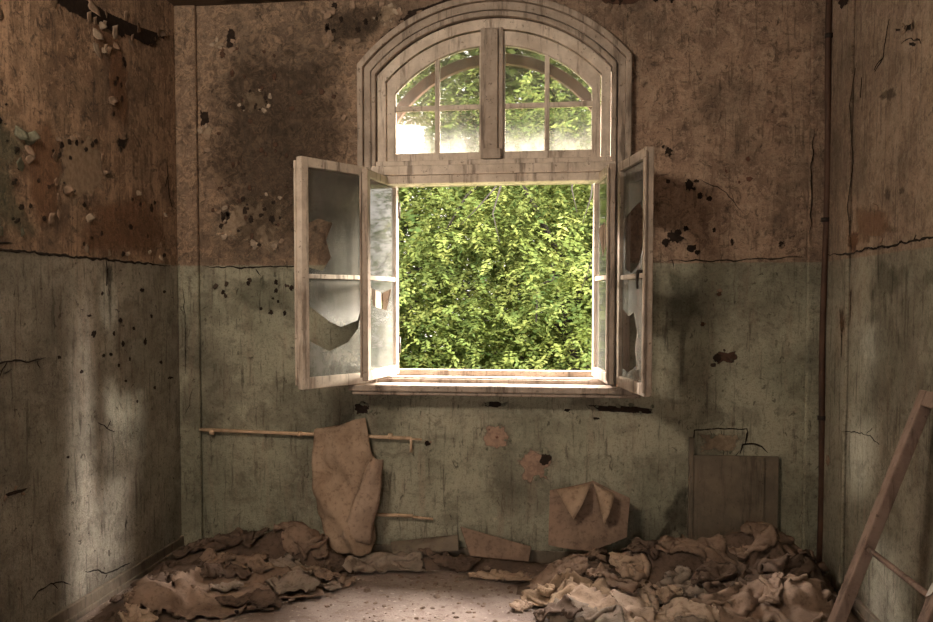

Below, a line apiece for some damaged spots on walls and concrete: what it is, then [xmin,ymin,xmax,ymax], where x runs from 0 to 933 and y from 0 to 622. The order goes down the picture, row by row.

crack [0,242,167,286]
peeling [50,0,167,152]
crack [670,131,815,268]
crack [828,21,933,256]
flaking render [710,349,738,367]
flaking render [518,448,552,483]